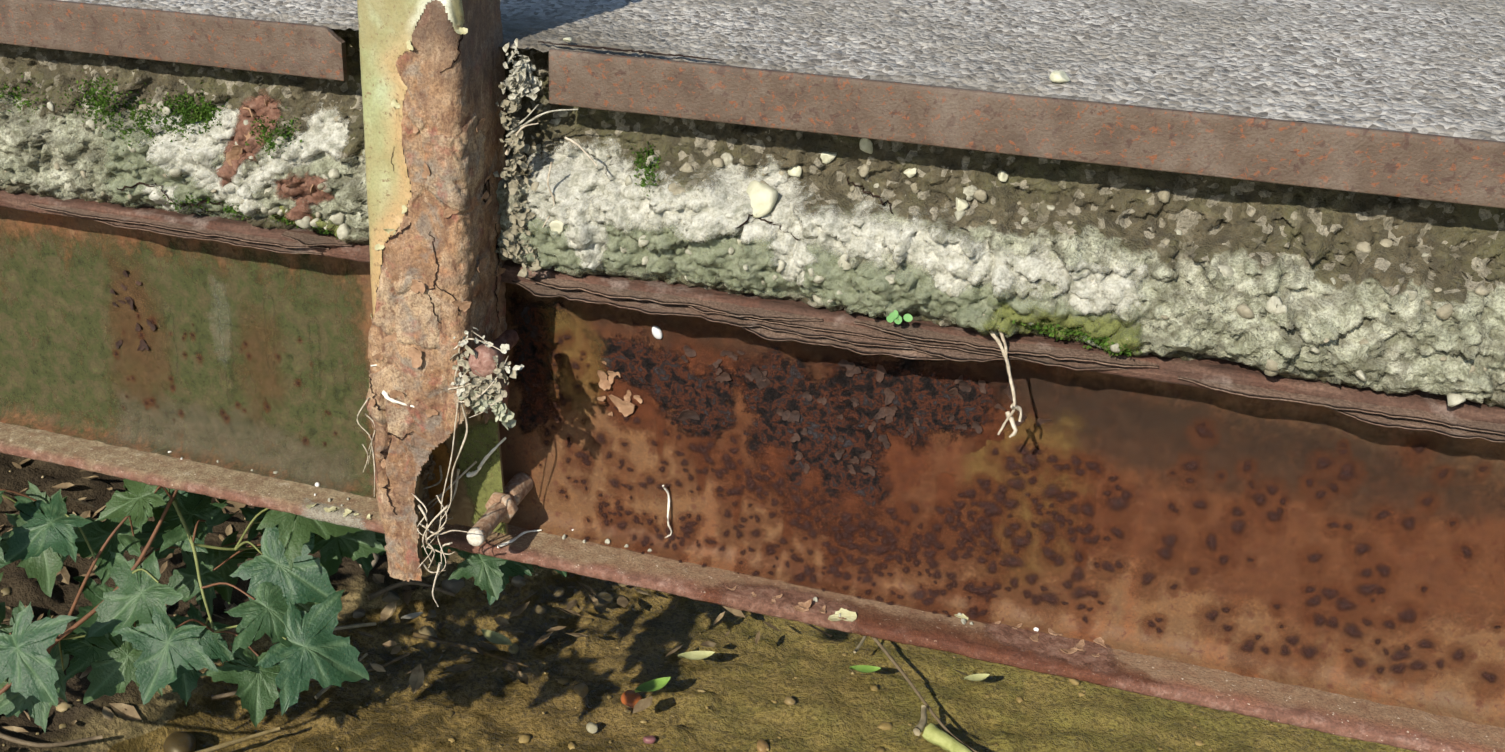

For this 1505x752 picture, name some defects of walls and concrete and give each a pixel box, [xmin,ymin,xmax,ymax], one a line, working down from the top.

rust [215,94,280,187]
spalling [0,0,1505,582]
rust [493,275,1159,550]
rust [1178,376,1505,442]